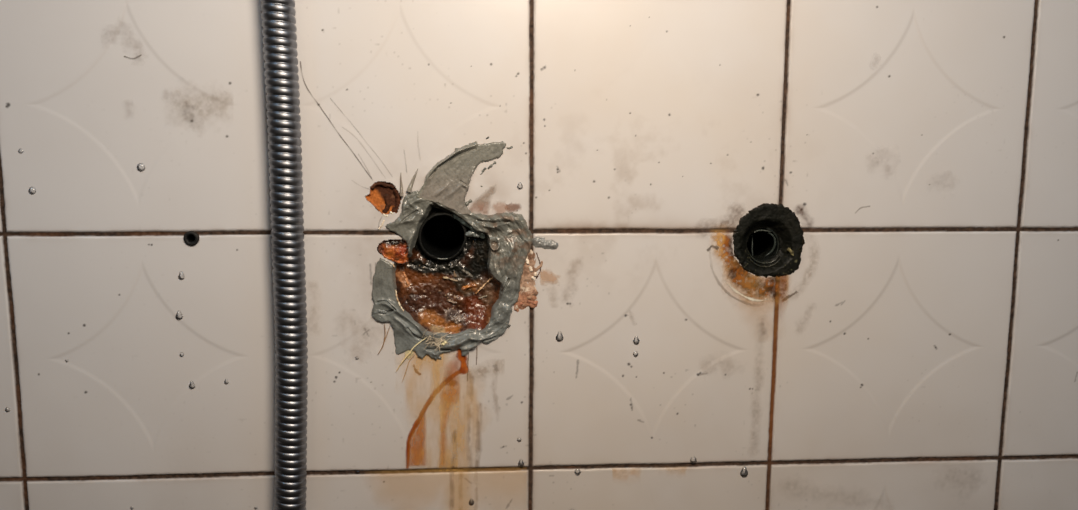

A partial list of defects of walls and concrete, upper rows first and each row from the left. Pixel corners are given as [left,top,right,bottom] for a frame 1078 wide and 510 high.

spalling [365,181,500,334]
corrosion [715,233,787,300]
corrosion [406,349,468,470]